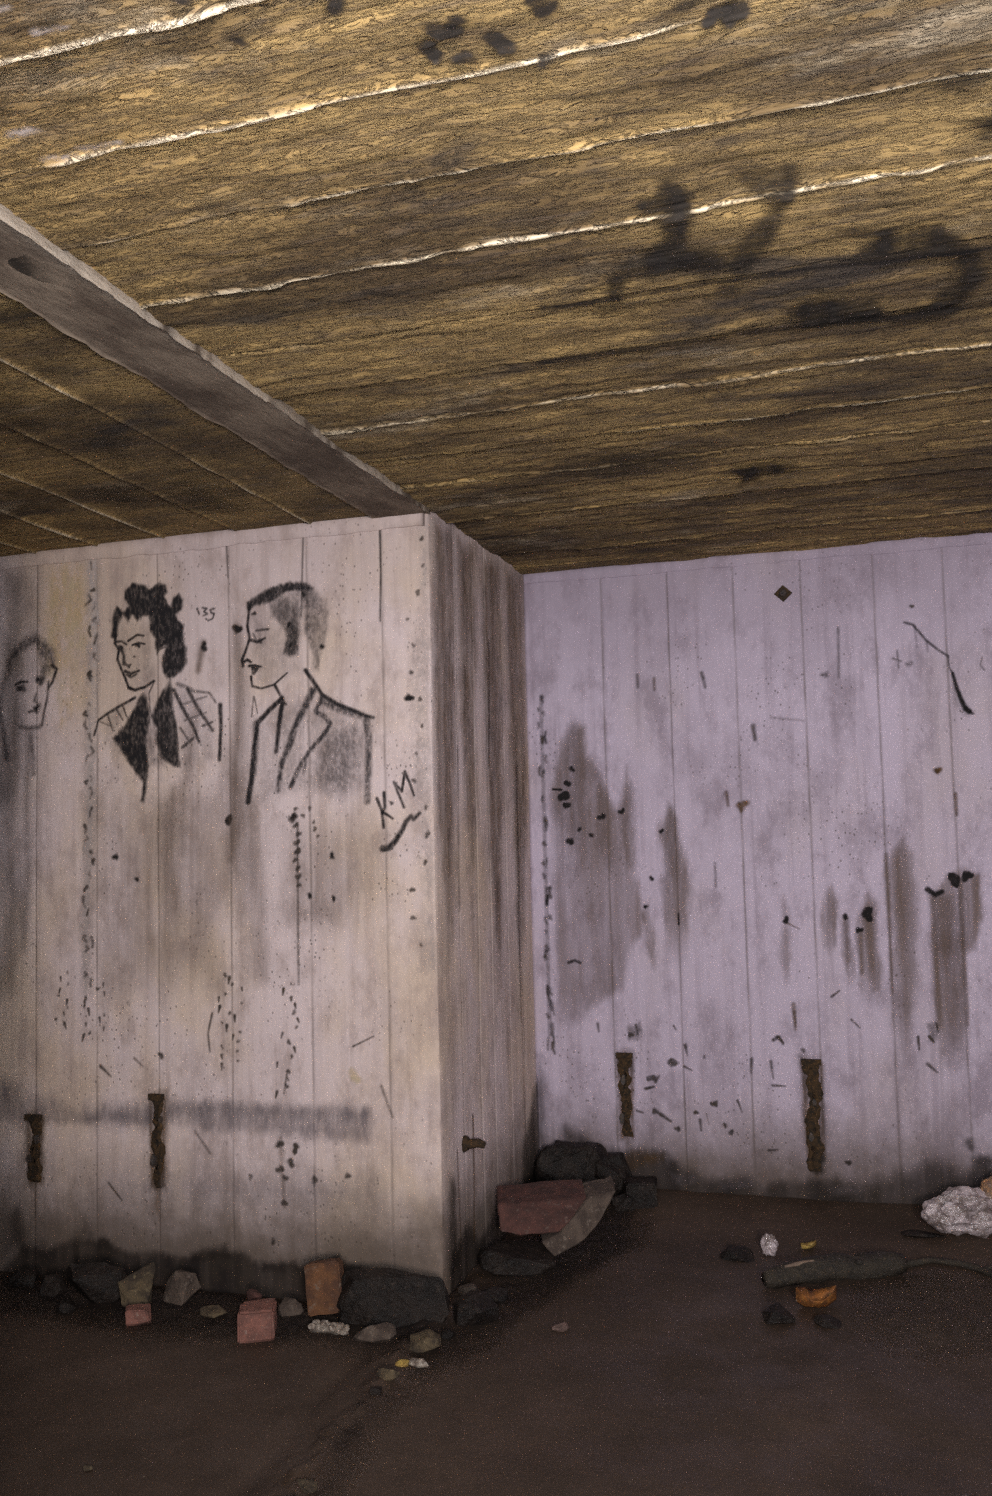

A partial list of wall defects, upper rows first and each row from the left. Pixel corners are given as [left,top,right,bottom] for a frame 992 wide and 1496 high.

water stain [442,611,470,870]
water stain [552,766,575,808]
water stain [566,808,625,845]
water stain [834,904,873,941]
water stain [896,856,905,963]
water stain [925,871,980,935]
corrosion [24,1114,43,1182]
corrosion [148,1093,166,1188]
corrosion [616,1052,634,1137]
corrosion [801,1059,825,1173]
water stain [452,1212,509,1292]